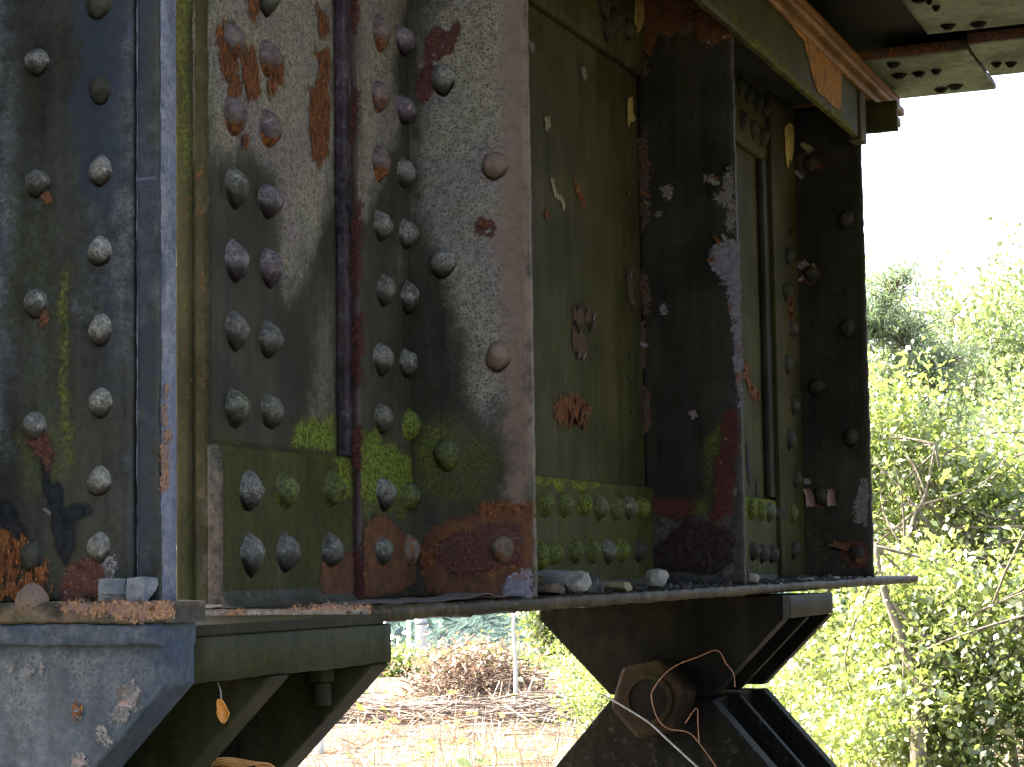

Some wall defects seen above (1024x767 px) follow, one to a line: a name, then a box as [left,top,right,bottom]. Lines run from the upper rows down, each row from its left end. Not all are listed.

corrosion [215,17,286,103]
corrosion [308,1,332,171]
corrosion [415,18,462,104]
corrosion [475,214,497,237]
peeling [703,166,761,410]
leakage [40,452,92,566]
corrosion [0,526,176,625]
corrosion [159,383,173,493]
corrosion [287,495,539,614]
corrosion [653,404,742,575]
peeling [95,676,143,748]